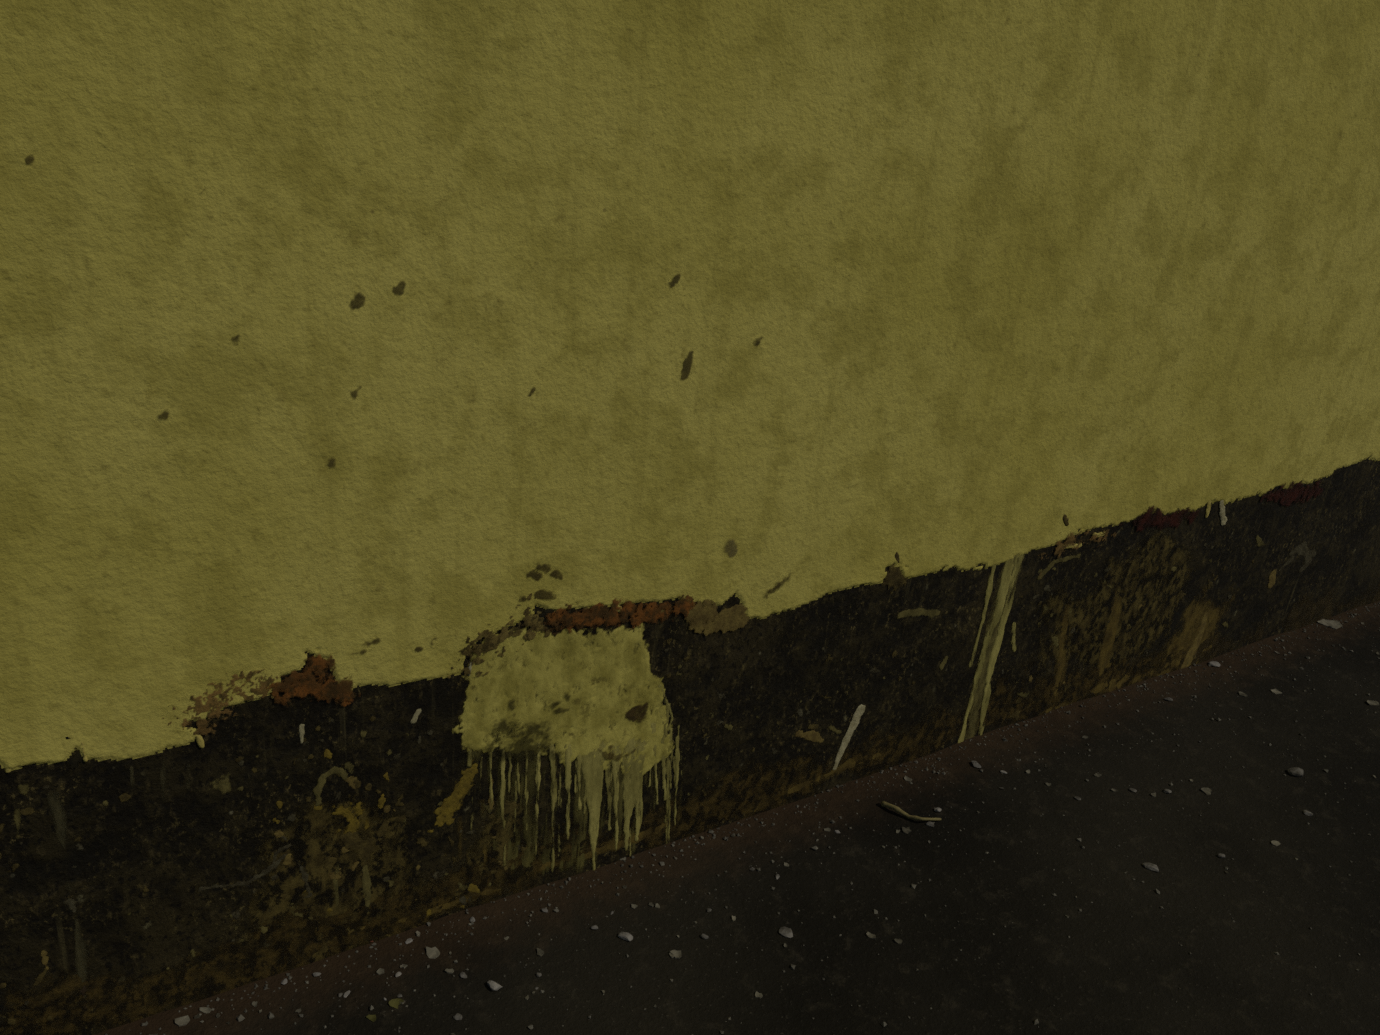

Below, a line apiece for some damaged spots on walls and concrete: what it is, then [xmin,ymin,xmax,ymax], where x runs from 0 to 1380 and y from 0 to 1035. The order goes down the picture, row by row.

water stain [0,533,1232,1035]